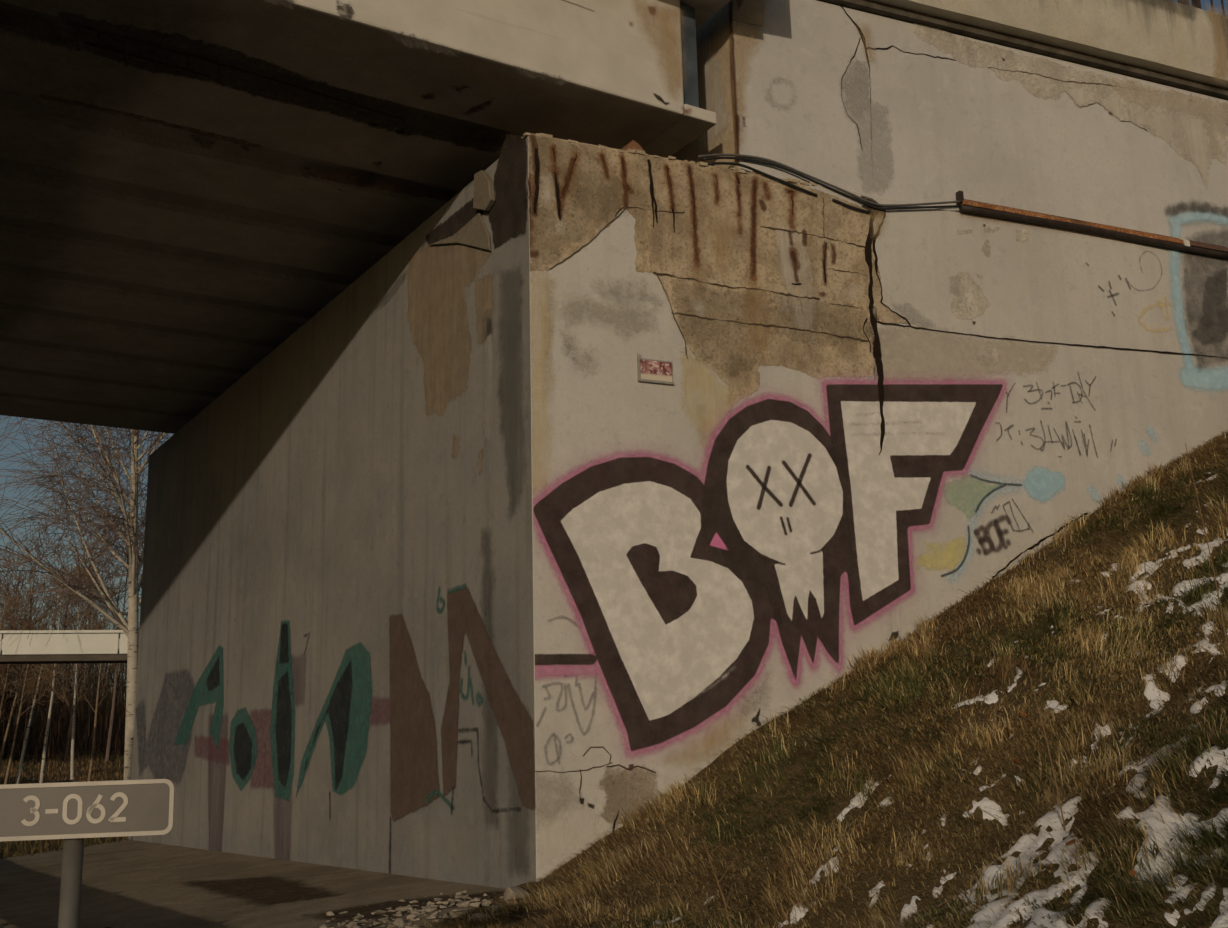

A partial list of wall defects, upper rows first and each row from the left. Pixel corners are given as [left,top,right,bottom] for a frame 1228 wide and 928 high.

peeling [914,23,1228,185]
corrosion [528,134,578,257]
corrosion [600,154,633,207]
corrosion [647,159,675,232]
corrosion [688,166,699,265]
spalling [407,132,1054,416]
corrosion [736,173,770,280]
corrosion [787,189,807,285]
corrosion [819,242,836,296]
crack [653,5,1224,455]